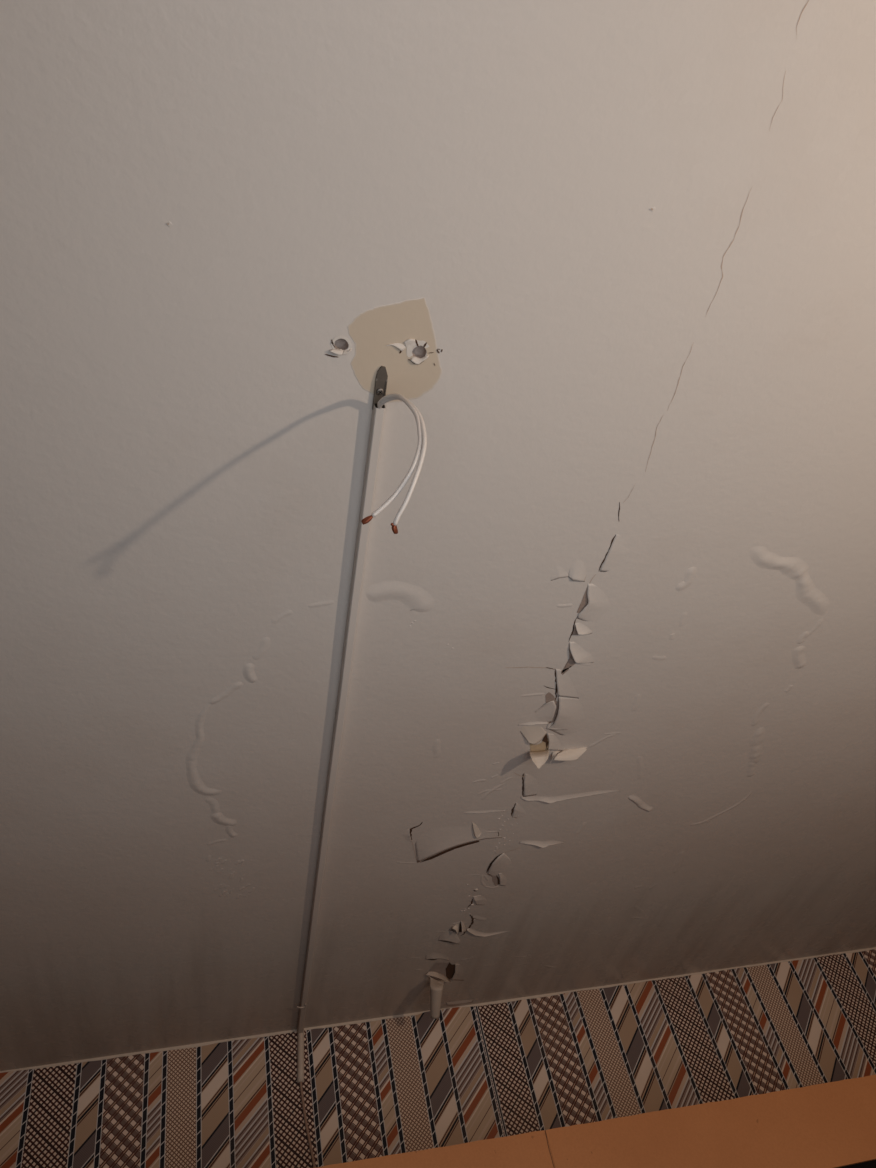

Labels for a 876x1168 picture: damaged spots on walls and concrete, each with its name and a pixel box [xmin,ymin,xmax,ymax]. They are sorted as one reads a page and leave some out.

crack [706,192,750,315]
crack [590,342,694,582]
peeling [507,559,621,777]
peeling [520,790,653,812]
peeling [396,822,564,1019]